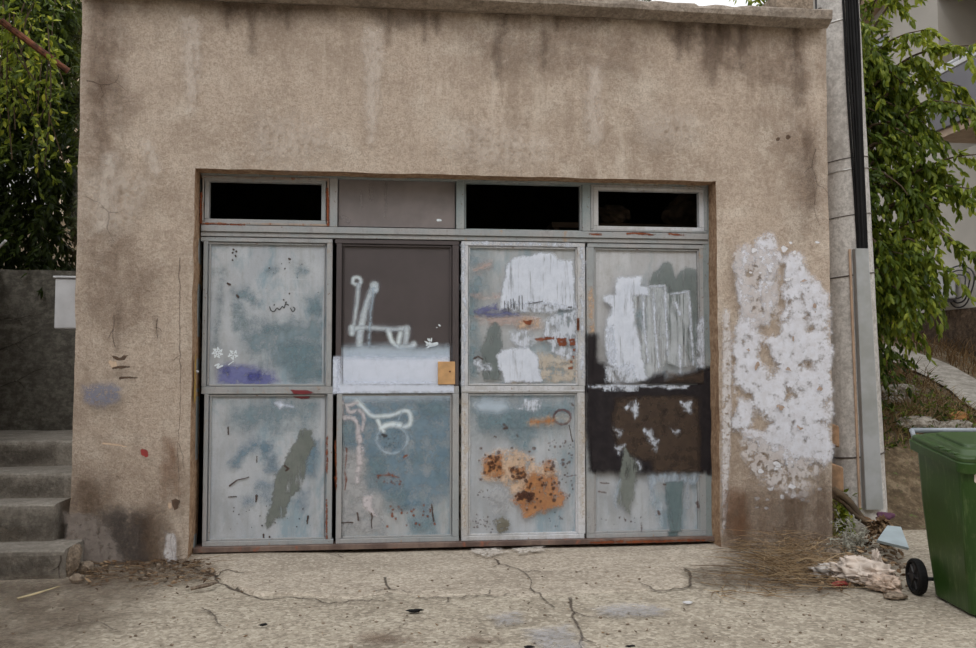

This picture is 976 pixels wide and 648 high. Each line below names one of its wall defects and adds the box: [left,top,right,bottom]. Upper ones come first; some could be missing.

peeling [731,233,834,510]
rust [478,447,571,518]
leakage [101,509,150,564]
crack [185,558,608,648]
crack [643,568,725,591]